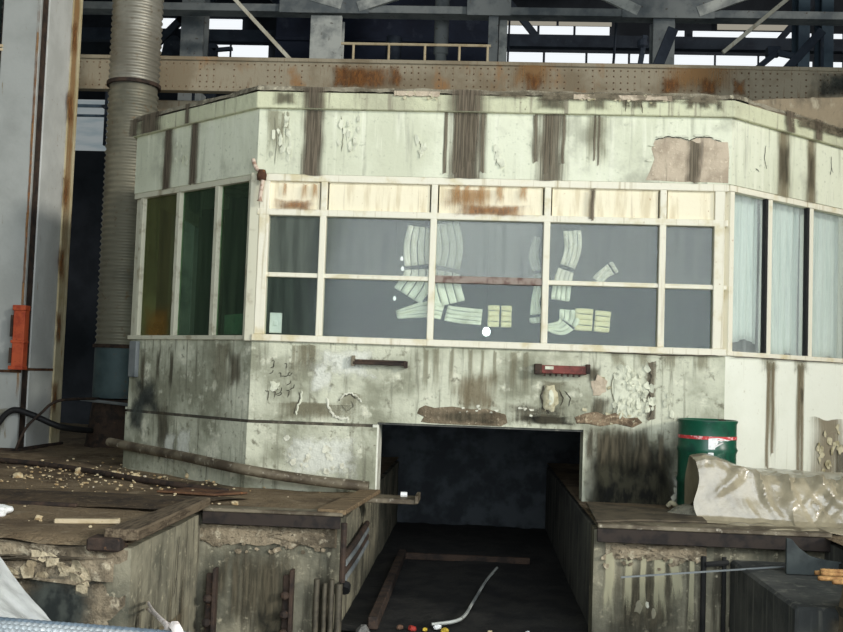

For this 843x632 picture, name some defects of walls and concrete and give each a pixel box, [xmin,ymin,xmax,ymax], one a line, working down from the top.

rust [336,68,400,86]
rust [517,65,545,90]
rust [665,68,727,93]
water stain [301,87,325,176]
water stain [443,89,486,179]
water stain [533,97,565,181]
flaking render [645,134,729,184]
rust [455,185,518,215]
water stain [131,359,189,452]
spalling [417,405,507,426]
flaking render [575,361,674,428]
spalling [0,514,337,632]